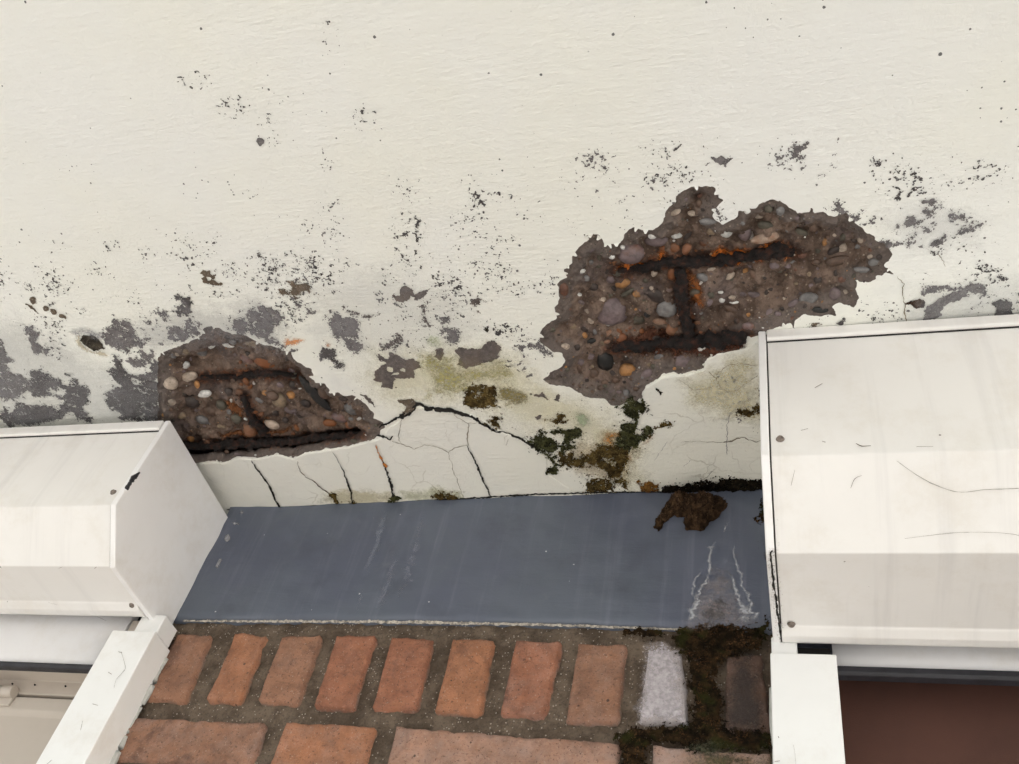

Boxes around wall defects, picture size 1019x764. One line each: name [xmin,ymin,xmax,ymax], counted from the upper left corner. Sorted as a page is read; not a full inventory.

peeling [757,134,816,179]
spalling [0,141,1019,463]
rust [611,241,795,359]
rust [200,369,297,381]
rust [184,393,359,452]
damp [426,356,510,392]
damp [498,388,527,404]
crack [376,402,669,503]
crack [251,453,360,507]